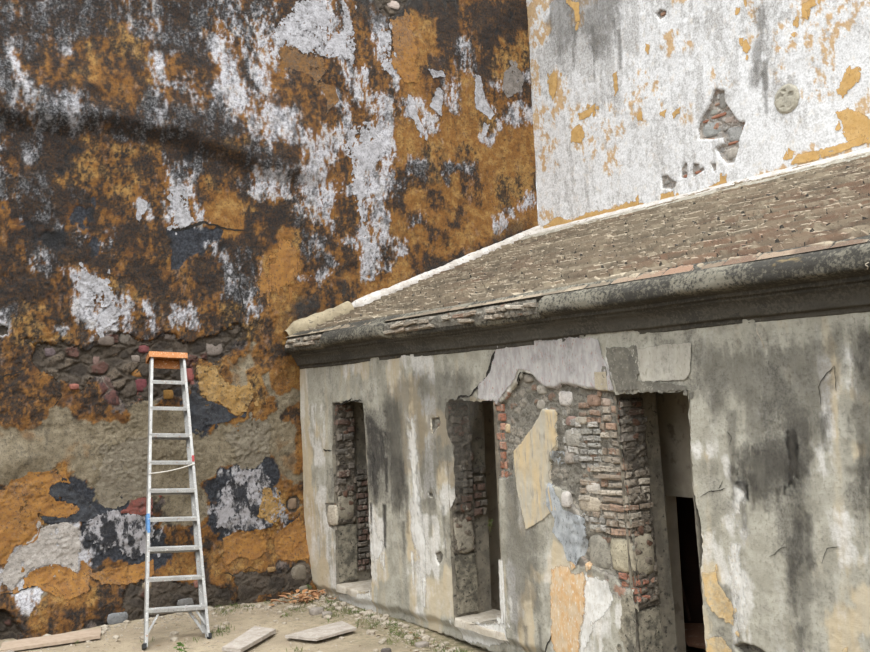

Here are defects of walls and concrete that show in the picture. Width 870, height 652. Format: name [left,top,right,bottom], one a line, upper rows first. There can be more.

peeling [272,0,357,114]
peeling [373,0,446,141]
peeling [475,74,495,136]
peeling [571,103,599,143]
spalling [660,90,745,200]
peeling [783,66,870,165]
crack [171,221,245,231]
crack [457,351,495,400]
spalling [0,262,313,625]
spalling [432,337,693,652]
peeling [702,565,764,652]
water stain [729,487,747,646]